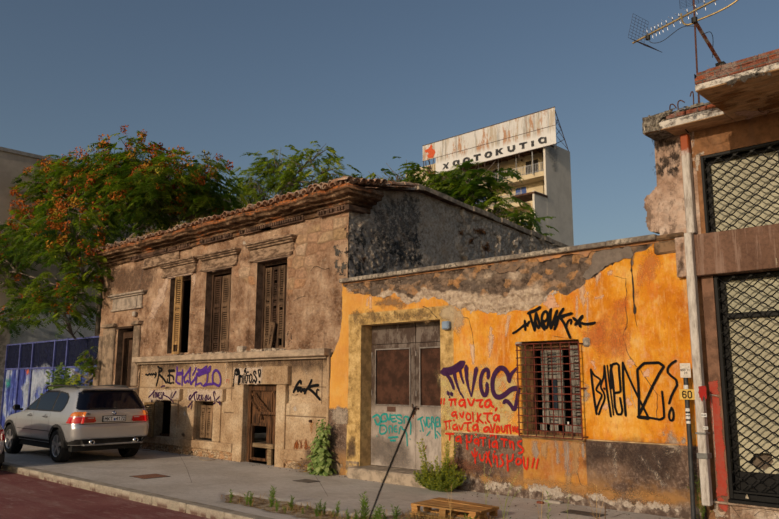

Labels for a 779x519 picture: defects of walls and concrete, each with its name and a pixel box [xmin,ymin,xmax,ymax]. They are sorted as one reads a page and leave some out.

damp [705,70,771,112]
flaking render [343,243,656,329]
crack [616,254,660,416]
damp [532,441,678,493]